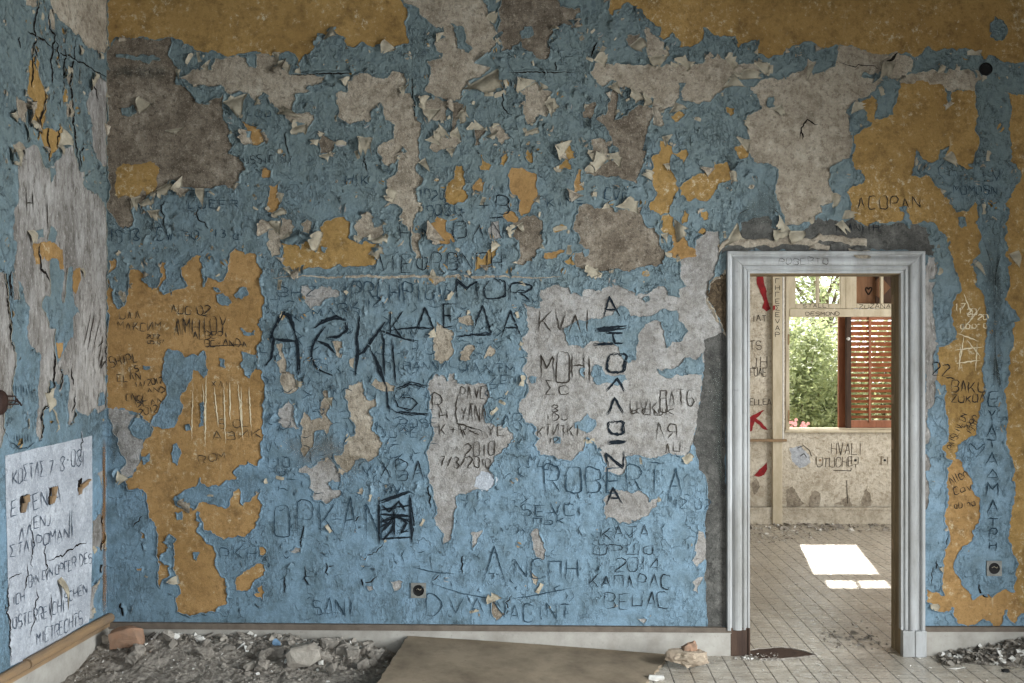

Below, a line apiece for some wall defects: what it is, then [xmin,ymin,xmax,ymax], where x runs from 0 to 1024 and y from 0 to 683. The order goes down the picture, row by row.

crack [18,2,107,171]
peeling [303,127,351,172]
crack [797,116,818,140]
peeling [298,280,356,314]
peeling [291,355,397,506]
peeling [420,372,529,545]
peeling [834,485,872,507]
peeling [235,544,268,610]